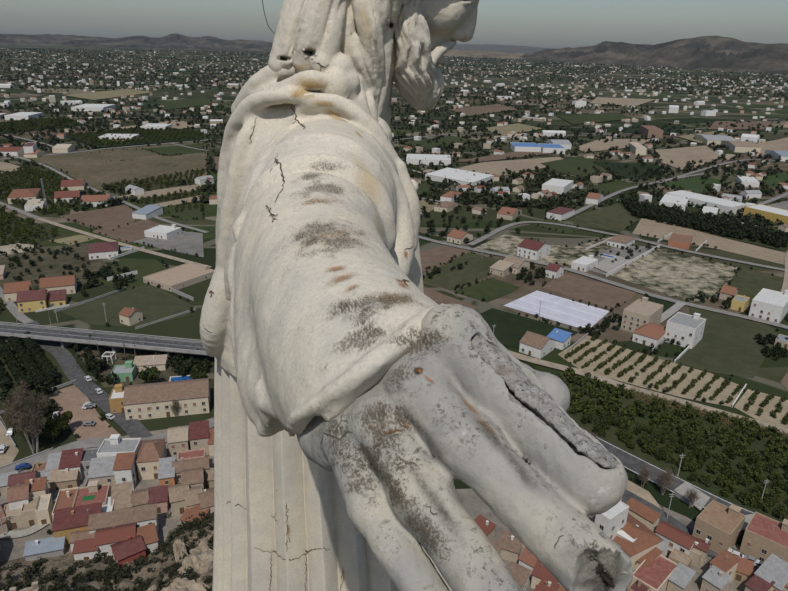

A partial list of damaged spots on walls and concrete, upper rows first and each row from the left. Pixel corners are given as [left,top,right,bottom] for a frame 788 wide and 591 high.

crack [266,154,285,222]
crack [256,503,329,591]
spalling [577,532,628,588]